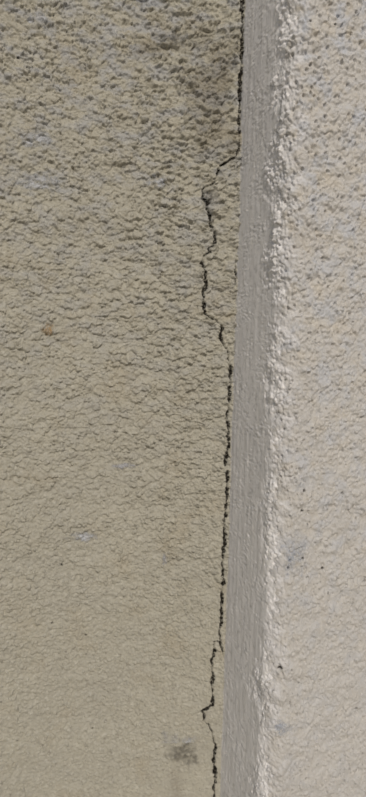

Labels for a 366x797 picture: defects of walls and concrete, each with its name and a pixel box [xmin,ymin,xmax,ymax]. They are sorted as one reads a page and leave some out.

crack [199,0,245,797]
crack [267,85,282,133]